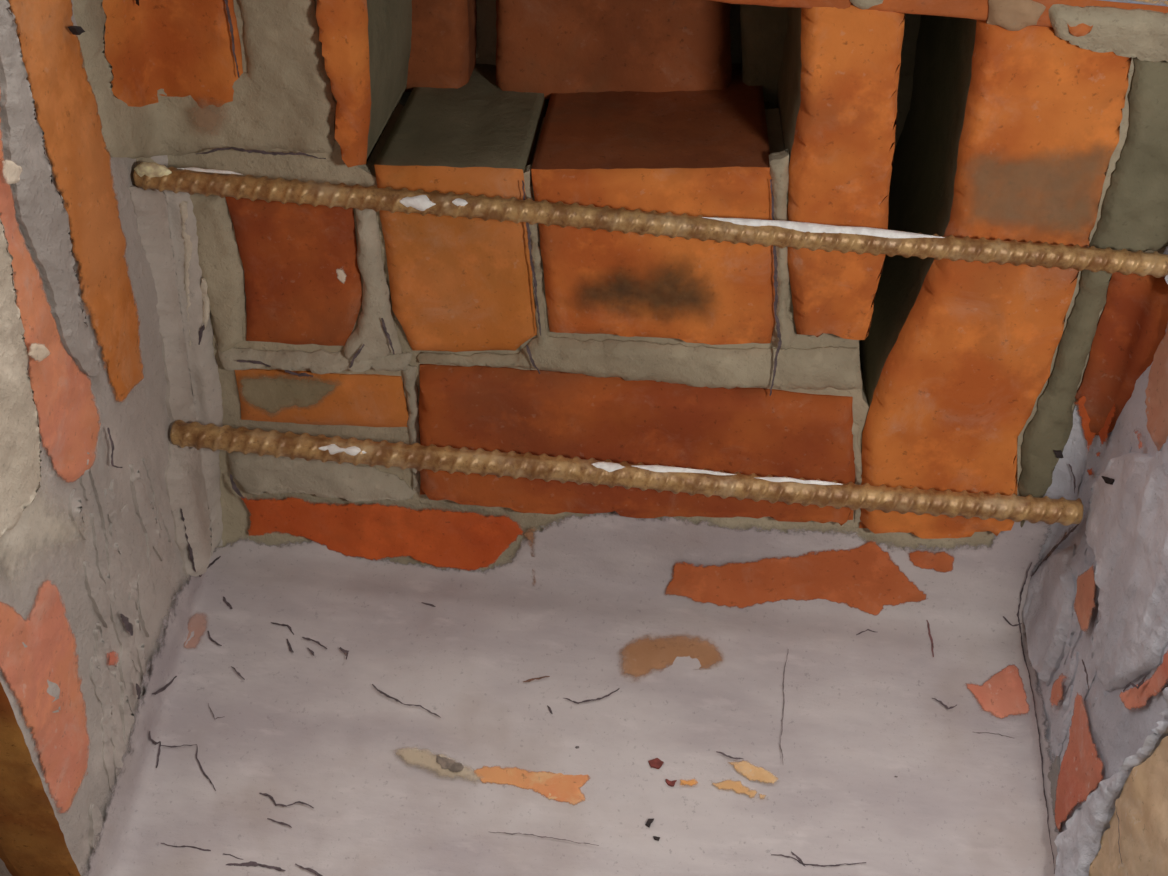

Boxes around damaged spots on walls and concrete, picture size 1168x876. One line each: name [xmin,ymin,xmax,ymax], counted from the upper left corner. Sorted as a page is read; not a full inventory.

spalling [68,26,85,35]
flaking render [1076,396,1115,485]
flaking render [1073,564,1095,631]
crack [271,622,349,660]
crack [523,676,620,714]
flaking render [1120,650,1168,710]
crack [149,731,216,791]
flaking render [1050,674,1103,830]
flaking render [474,766,590,805]
crack [259,793,314,828]
crack [161,843,322,876]
crack [771,851,866,867]